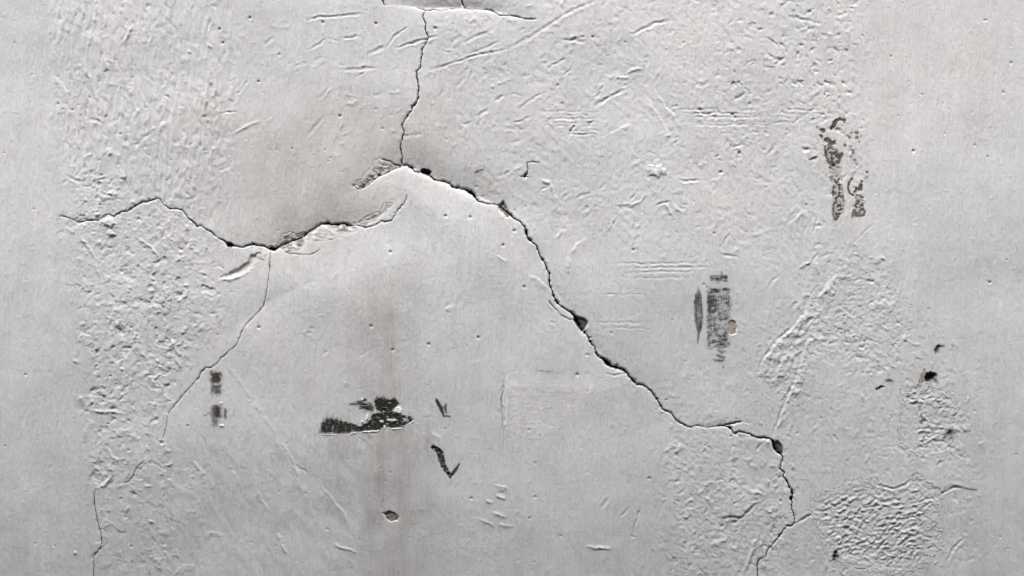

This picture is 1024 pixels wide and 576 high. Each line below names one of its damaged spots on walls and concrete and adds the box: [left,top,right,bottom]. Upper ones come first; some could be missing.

spalling [221,203,393,278]
crack [58,197,407,439]
crack [359,0,810,576]
peeling [694,274,736,361]
peeling [320,398,414,435]
spalling [431,445,460,478]
crack [93,489,103,574]